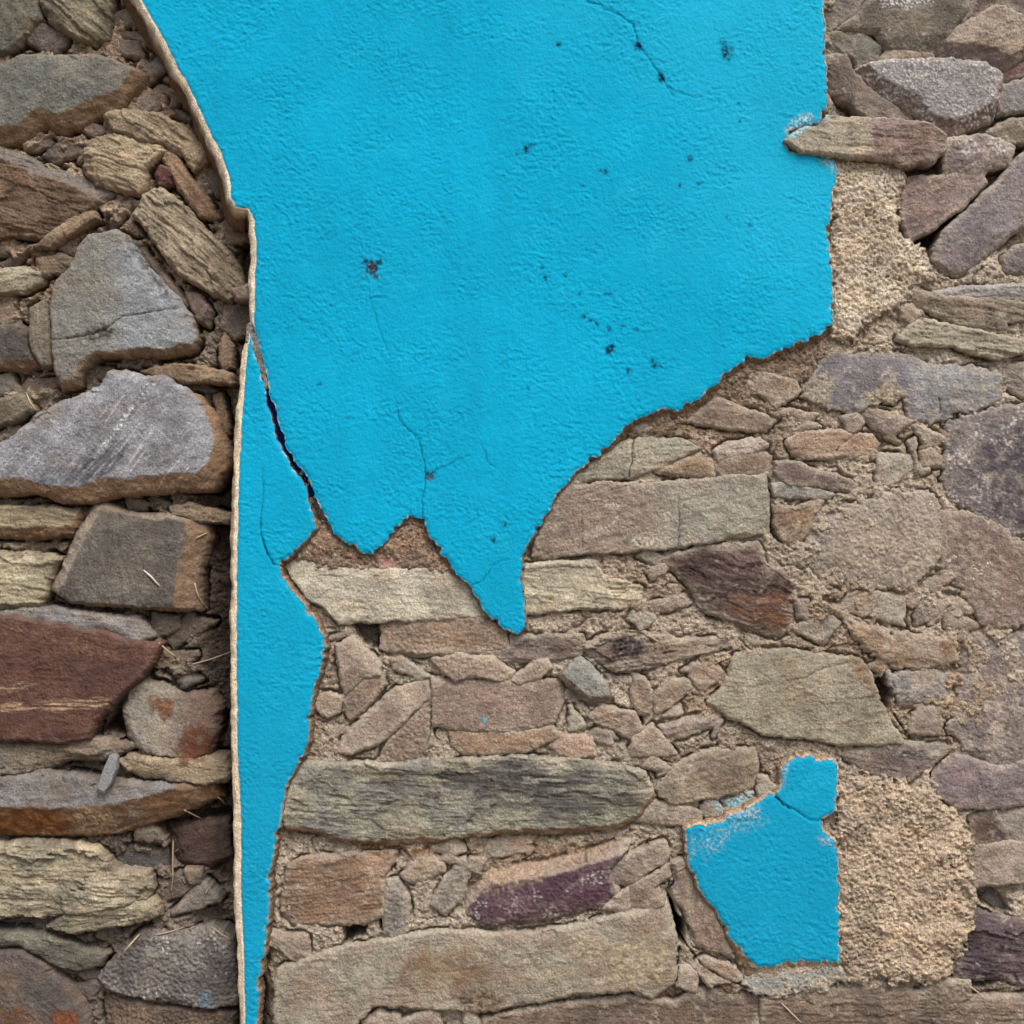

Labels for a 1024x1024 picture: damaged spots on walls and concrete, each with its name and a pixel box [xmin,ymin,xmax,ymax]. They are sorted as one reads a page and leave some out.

crack [245,322,332,530]
spalling [122,0,937,1024]